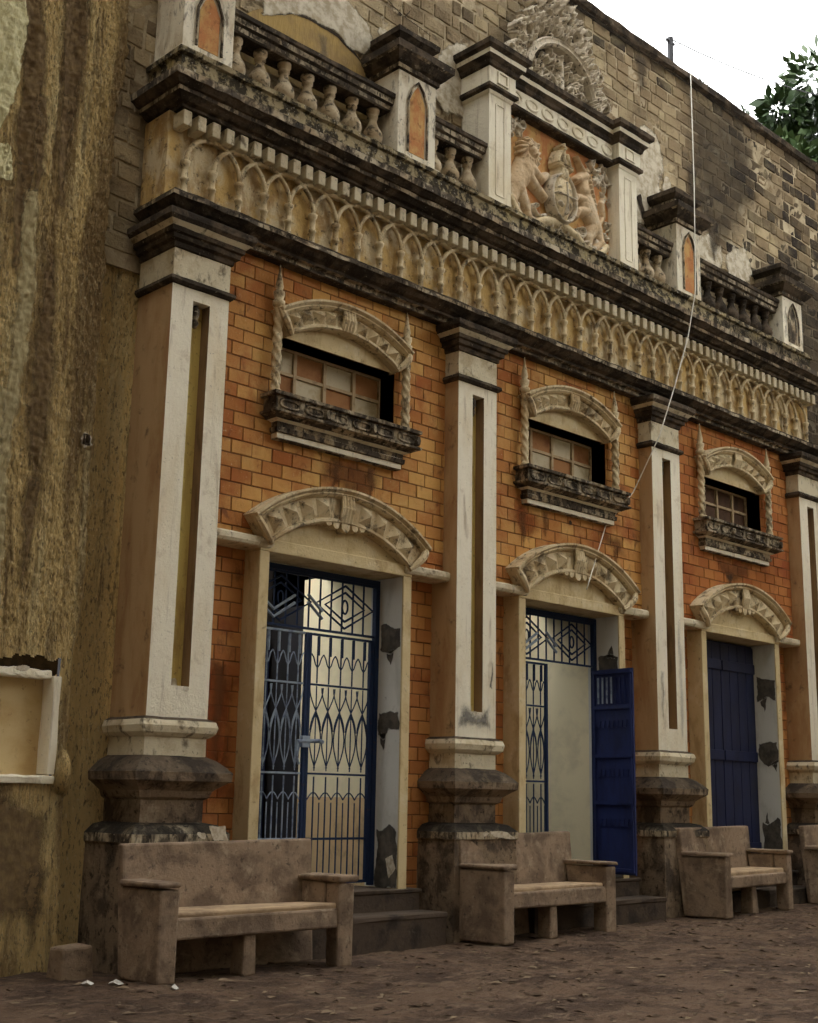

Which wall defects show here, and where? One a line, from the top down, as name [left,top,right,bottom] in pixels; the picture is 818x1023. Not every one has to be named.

flaking render [247,0,387,78]
damp [58,0,88,207]
damp [0,0,57,603]
flaking render [380,624,400,665]
flaking render [757,677,775,710]
flaking render [377,711,400,749]
flaking render [758,742,779,772]
flaking render [762,813,783,854]
flaking render [374,824,397,888]